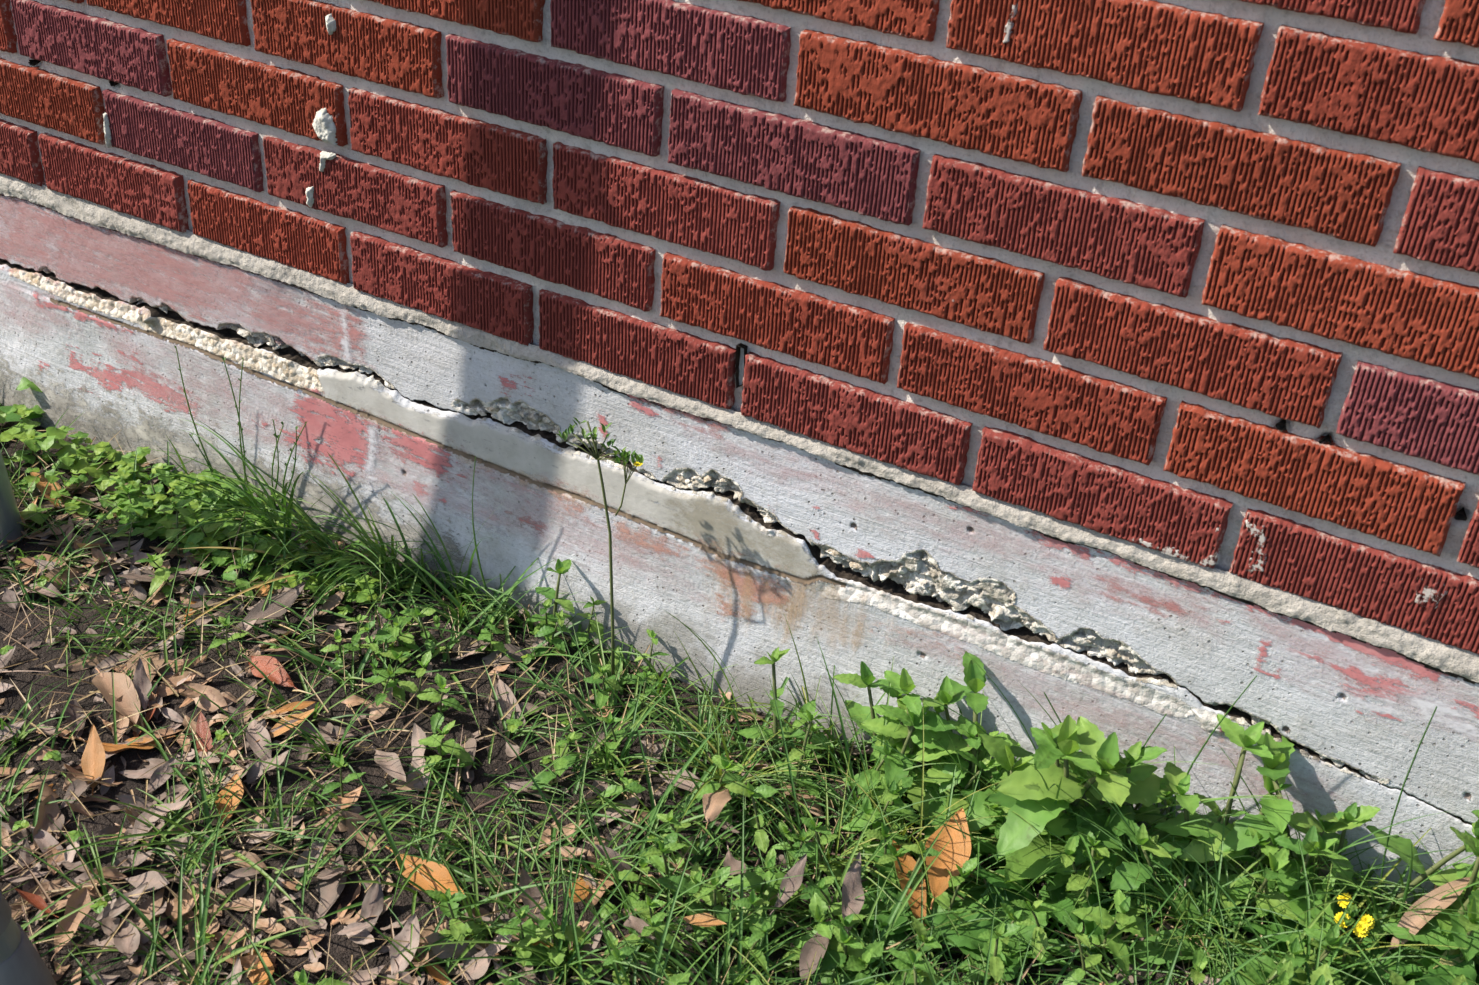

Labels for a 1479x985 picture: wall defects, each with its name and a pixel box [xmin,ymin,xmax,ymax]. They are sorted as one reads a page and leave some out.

crack [0,194,1479,825]
spalling [451,374,1181,689]
peeling [1025,531,1449,721]
spalling [1190,701,1390,784]